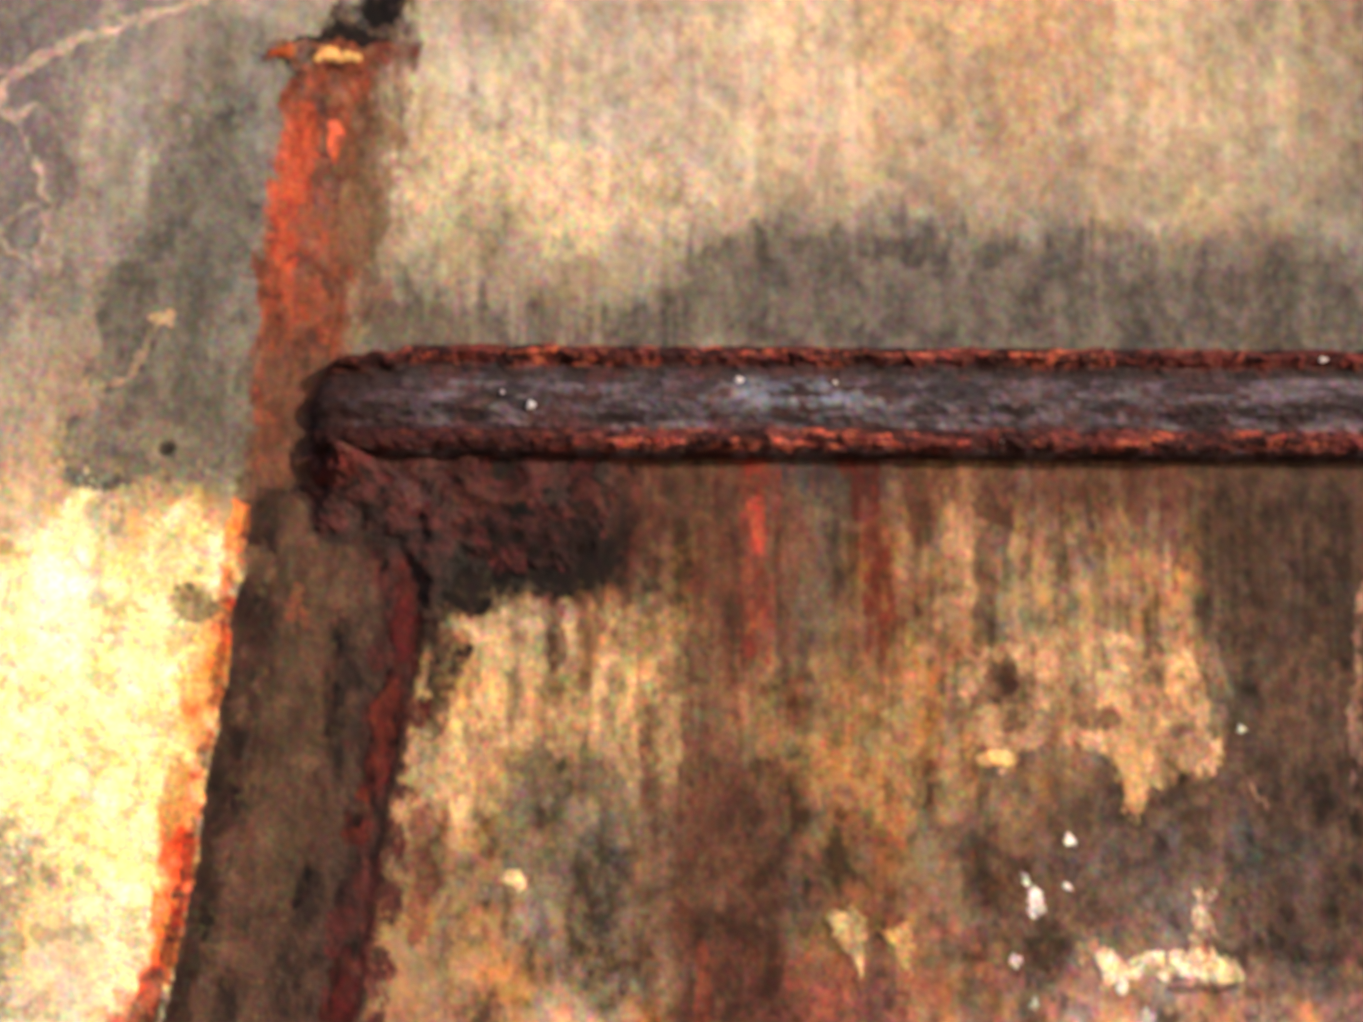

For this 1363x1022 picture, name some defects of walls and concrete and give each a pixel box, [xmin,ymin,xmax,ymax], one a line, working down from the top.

crack [0,0,264,273]
corrosion [206,0,429,580]
leakage [310,0,429,41]
leakage [357,93,1363,354]
leakage [1294,0,1324,83]
corrosion [97,627,213,1022]
corrosion [318,940,359,1022]
corrosion [339,663,406,845]
corrosion [403,802,449,951]
leakage [297,458,655,1022]
corrosion [541,459,1221,1022]
leakage [808,461,1363,992]